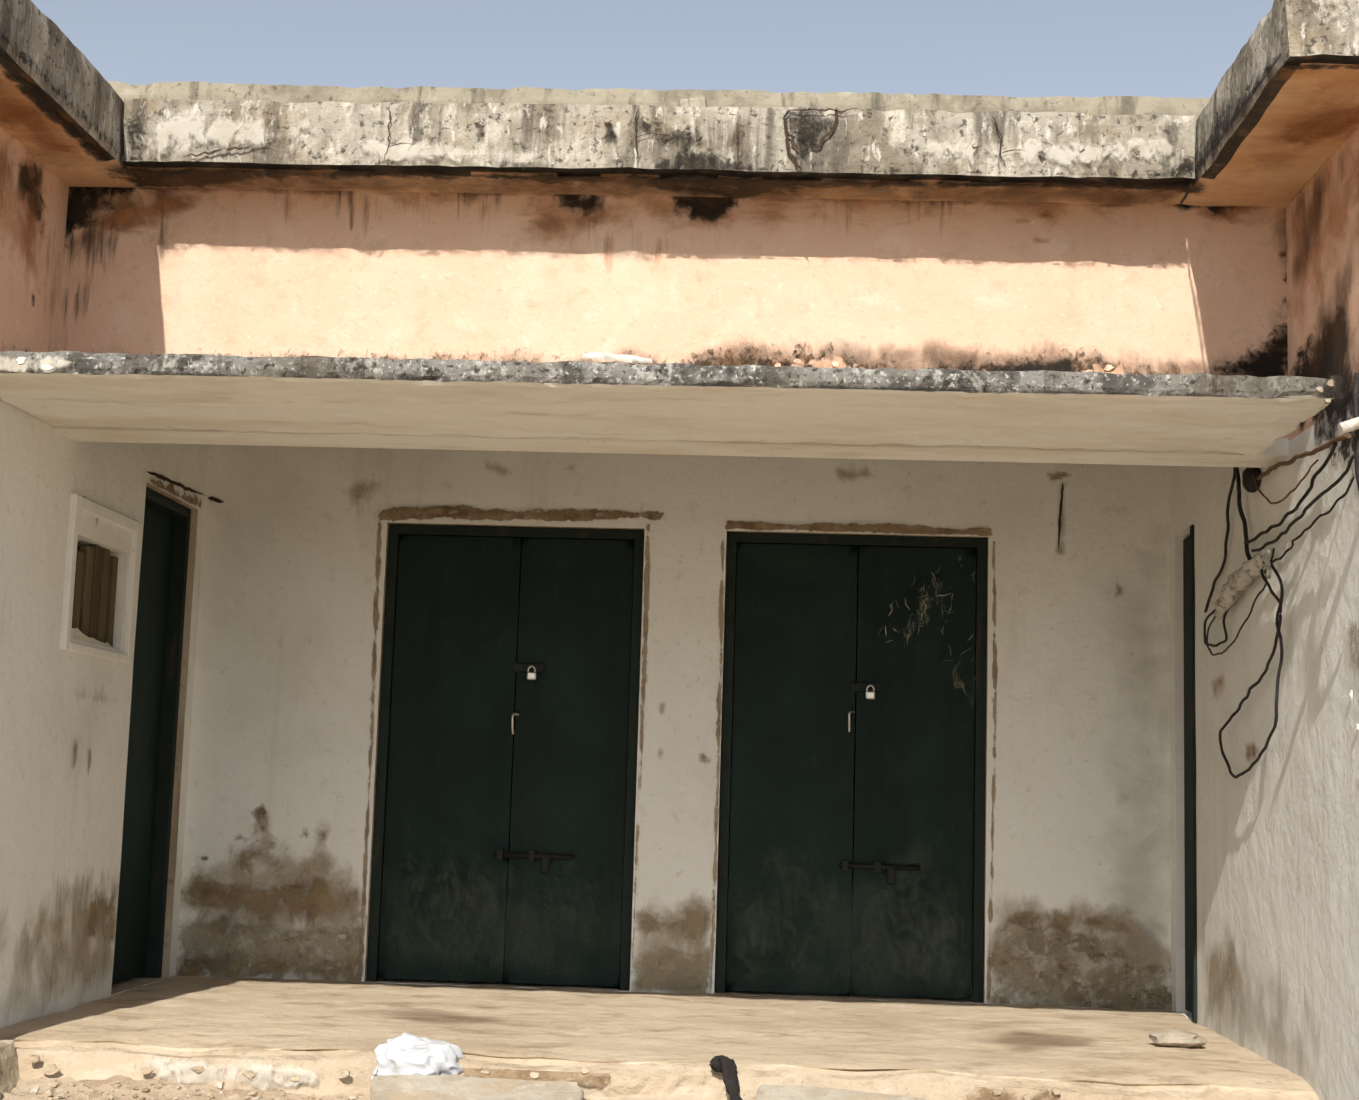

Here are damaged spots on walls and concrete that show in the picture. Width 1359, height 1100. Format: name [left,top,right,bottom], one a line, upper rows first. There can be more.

damp [0,2,1359,256]
damp [148,356,249,377]
damp [280,353,375,379]
damp [623,342,896,387]
damp [789,384,996,392]
damp [925,295,1356,477]
damp [25,894,115,989]
damp [178,837,364,982]
damp [634,903,711,993]
damp [990,908,1172,1010]